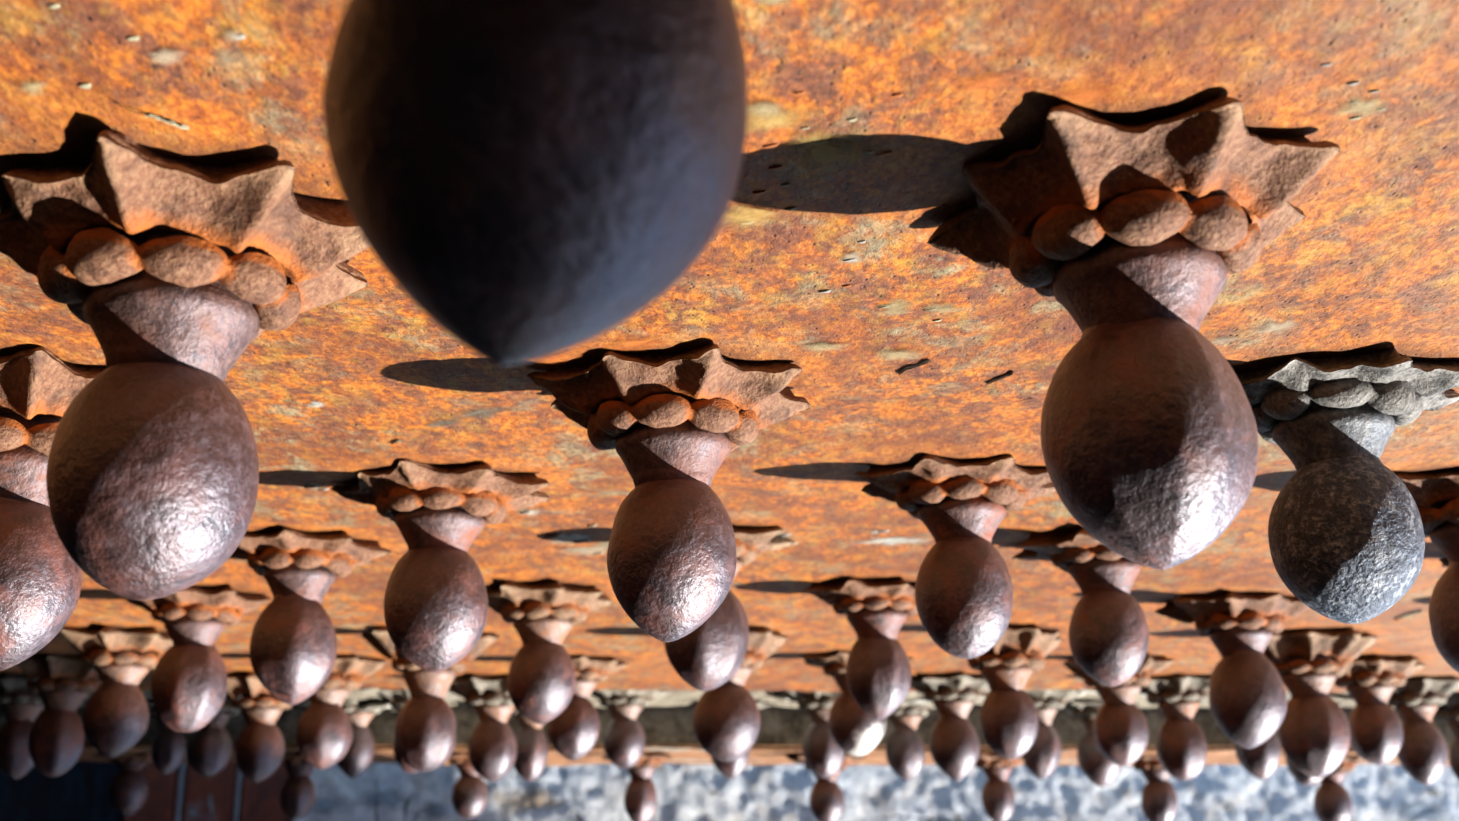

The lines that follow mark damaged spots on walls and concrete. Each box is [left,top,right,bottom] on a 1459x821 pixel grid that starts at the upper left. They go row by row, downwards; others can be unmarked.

rust [1061,89,1109,107]
rust [615,338,660,349]
rust [542,353,569,361]